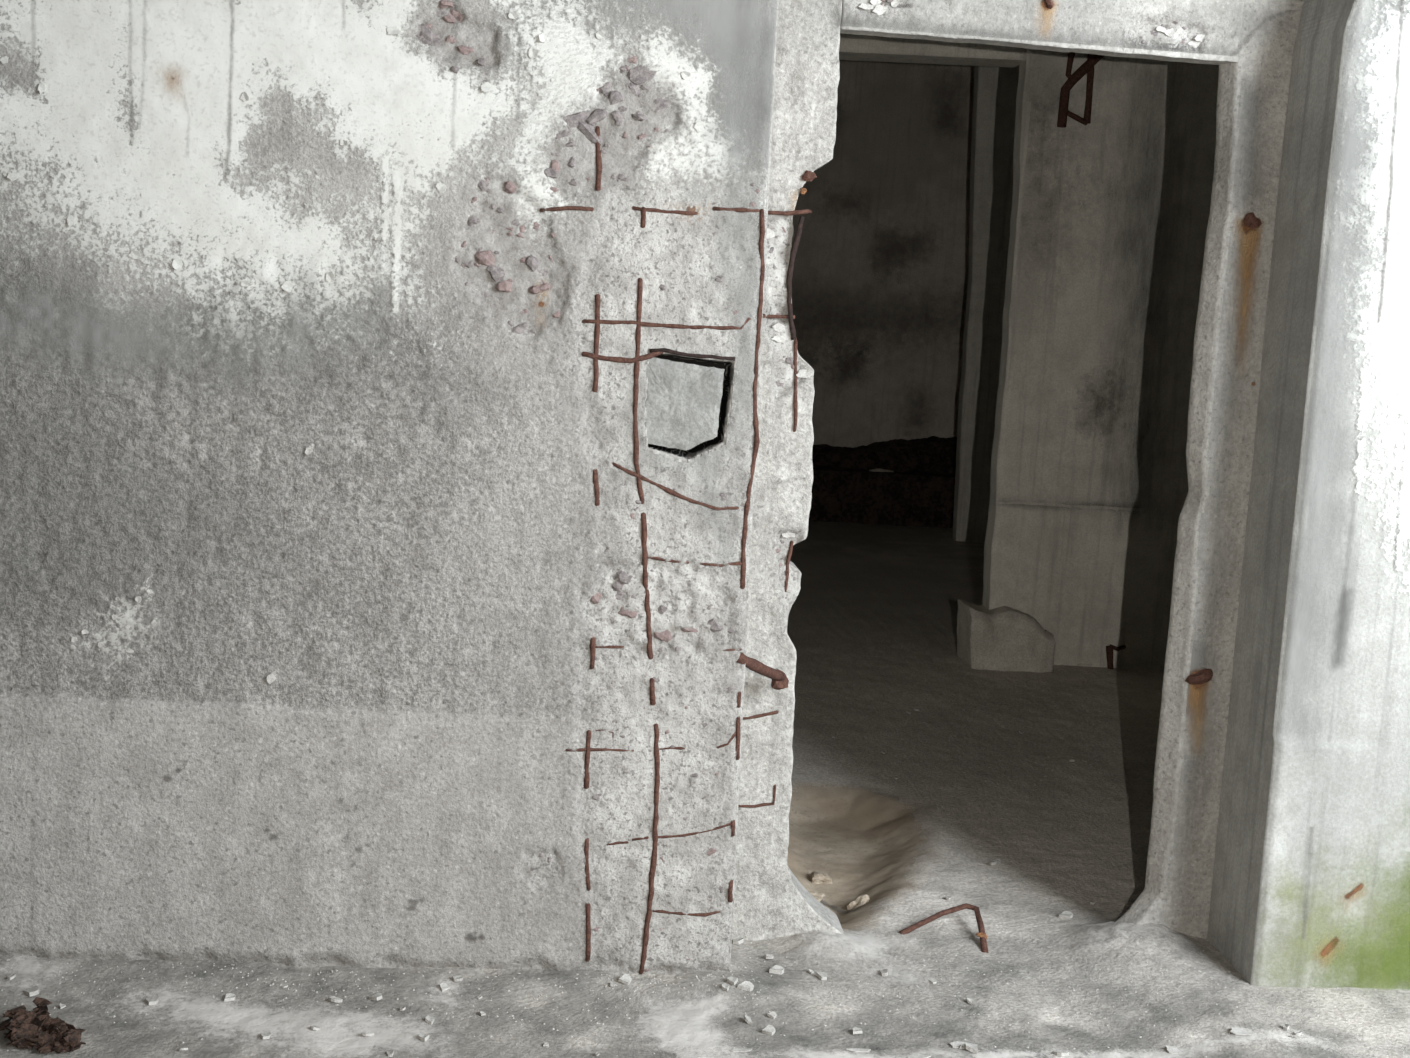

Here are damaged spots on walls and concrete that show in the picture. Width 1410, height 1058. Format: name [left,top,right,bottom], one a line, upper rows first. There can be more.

corrosion [1241,215,1258,333]
peeling [0,0,929,974]
corrosion [1321,937,1339,956]